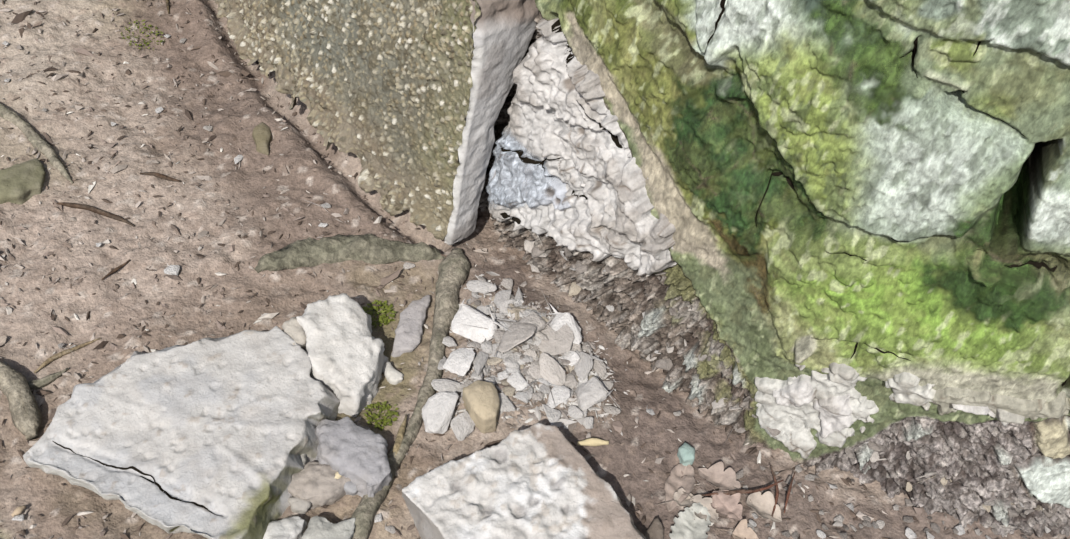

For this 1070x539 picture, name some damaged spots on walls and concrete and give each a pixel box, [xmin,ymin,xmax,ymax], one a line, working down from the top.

crack [704,0,726,55]